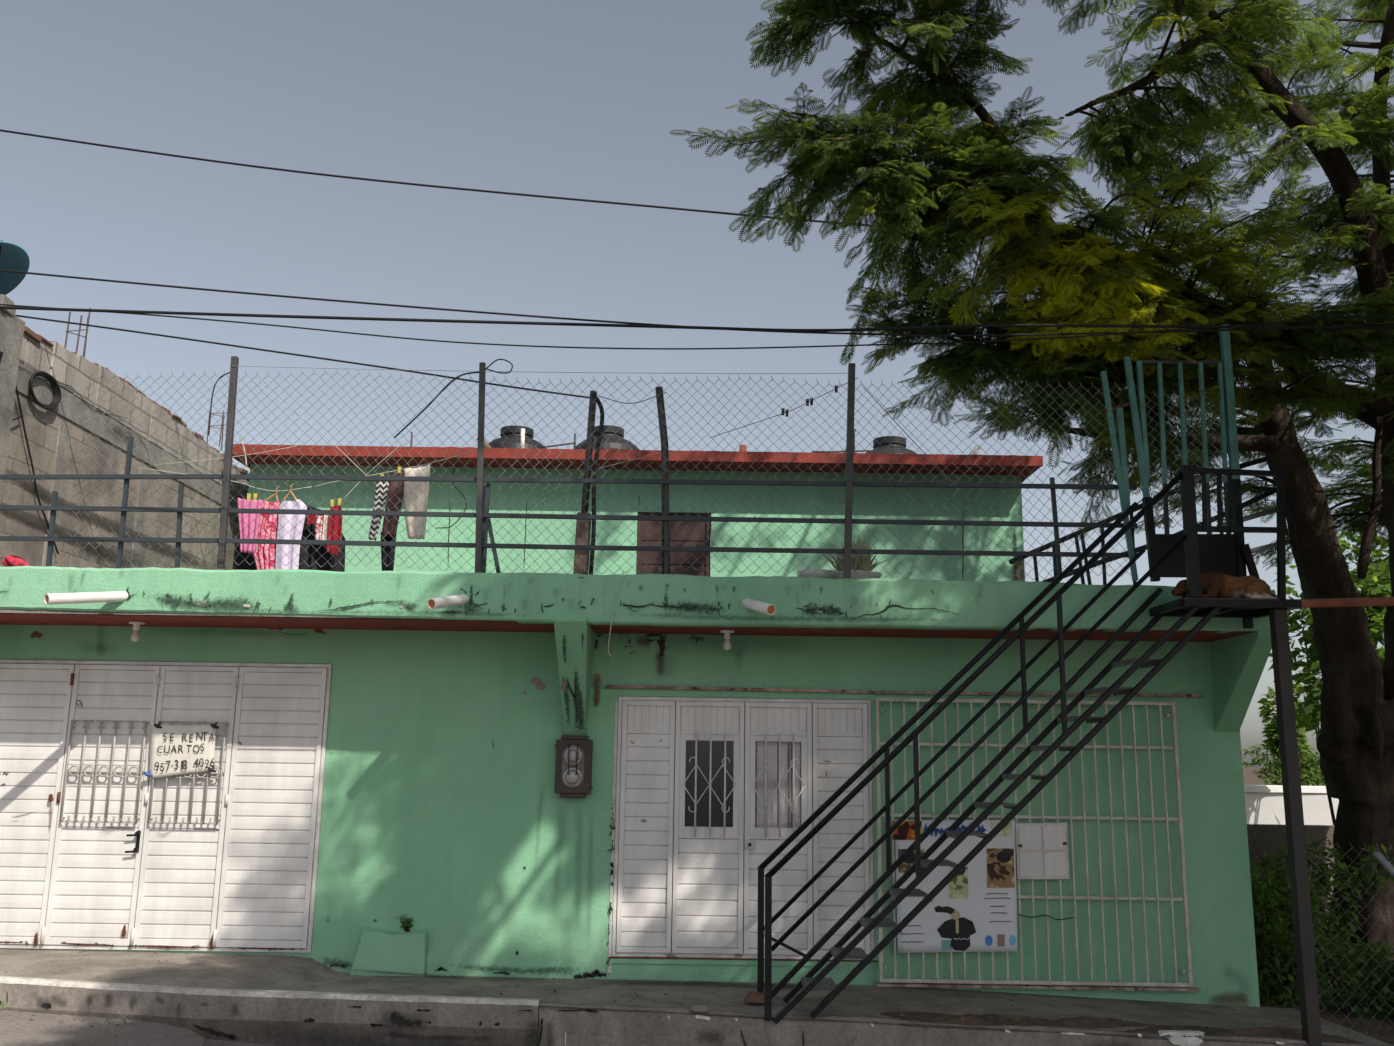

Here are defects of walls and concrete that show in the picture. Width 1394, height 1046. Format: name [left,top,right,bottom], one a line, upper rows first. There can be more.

crack [854,513,964,619]
leakage [195,587,516,616]
crack [320,599,403,611]
rust [640,634,669,672]
leakage [561,633,602,729]